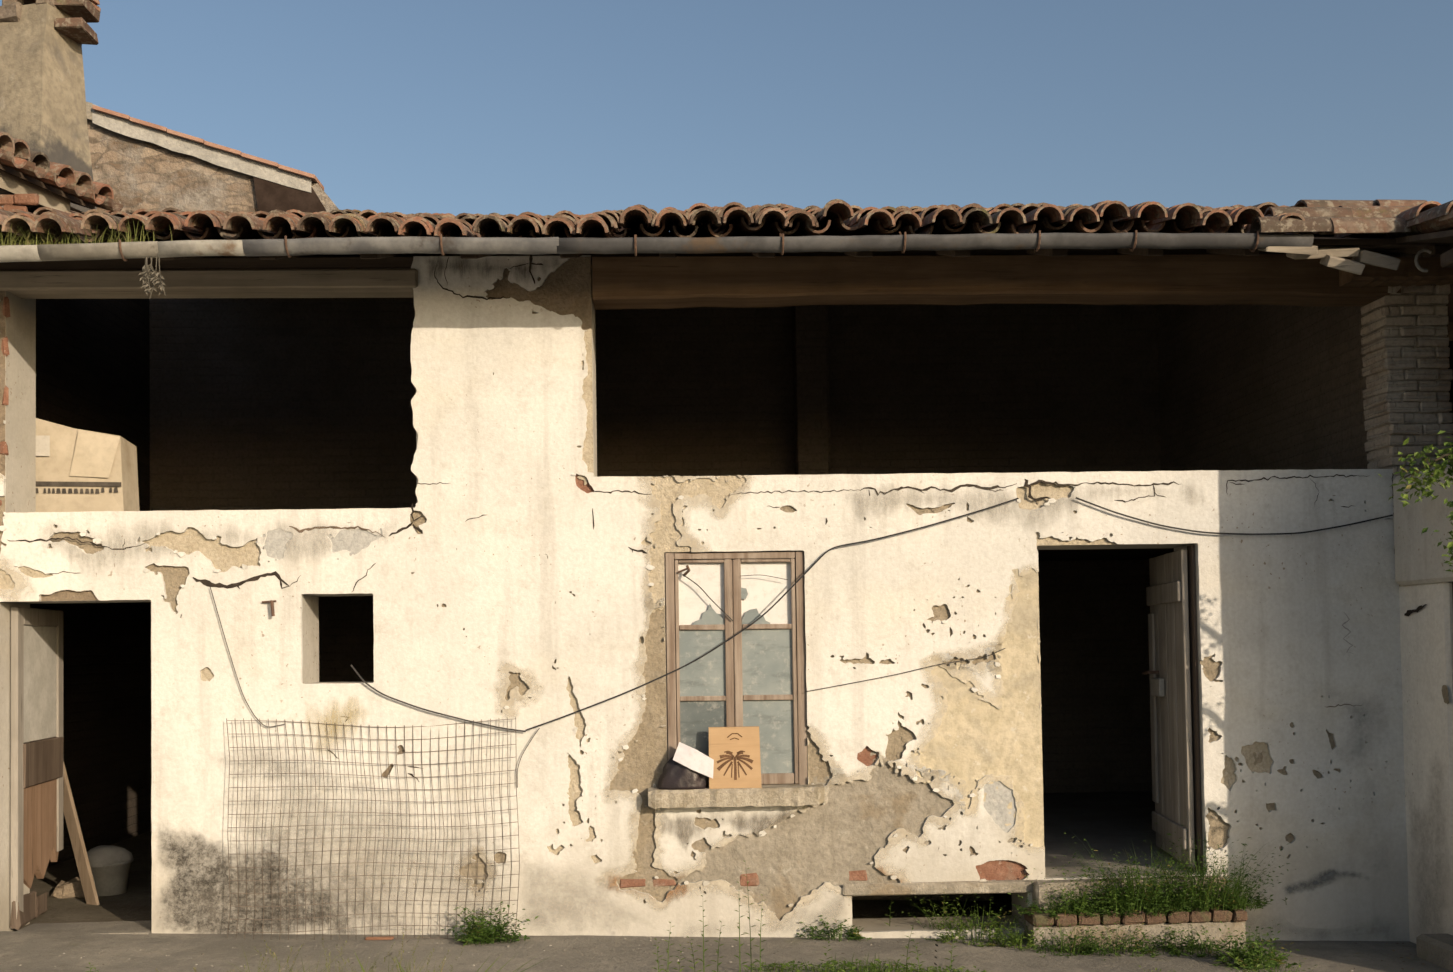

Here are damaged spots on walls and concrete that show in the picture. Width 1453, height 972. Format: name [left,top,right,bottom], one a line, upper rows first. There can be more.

flaking render [481,257,594,493]
flaking render [0,291,104,601]
flaking render [411,511,427,534]
crack [726,479,1179,524]
crack [1226,473,1395,554]
flaking render [138,527,293,614]
crack [193,571,300,589]
flaking render [497,663,541,716]
flaking render [547,475,1045,924]
flaking render [1200,655,1222,682]
flaking render [1208,728,1294,791]
water stain [163,836,345,934]